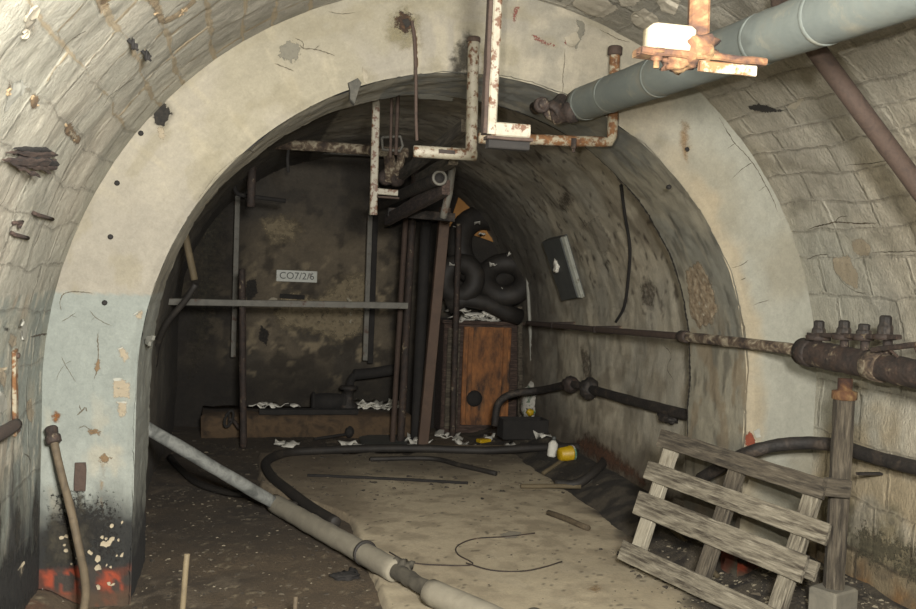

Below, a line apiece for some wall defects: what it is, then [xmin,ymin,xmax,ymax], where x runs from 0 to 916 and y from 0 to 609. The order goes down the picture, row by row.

corrosion [390,11,418,68]
leakage [0,484,128,609]
leakage [855,520,916,584]